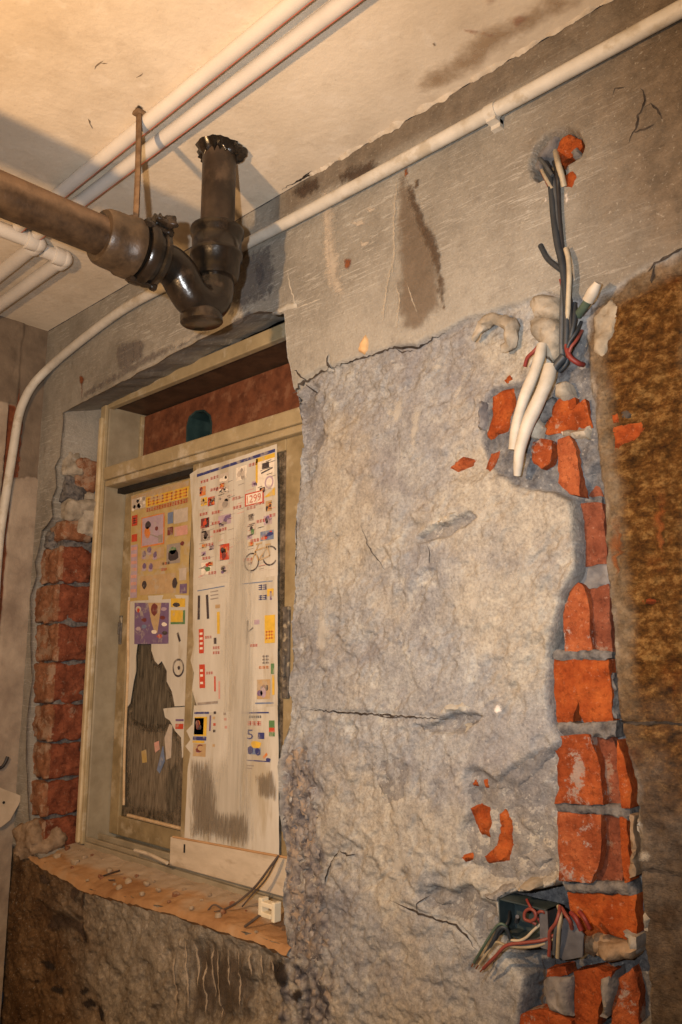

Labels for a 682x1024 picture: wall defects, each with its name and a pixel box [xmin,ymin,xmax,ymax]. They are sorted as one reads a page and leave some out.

water stain [431,13,537,86]
crack [613,87,662,141]
water stain [383,169,444,326]
crack [294,333,444,396]
crack [310,709,457,720]
flaking render [421,375,646,1024]
crack [392,896,473,947]